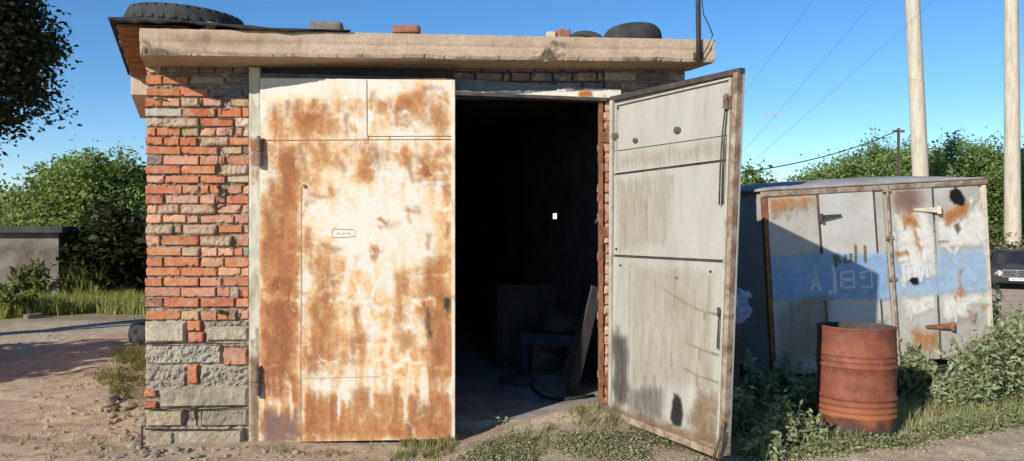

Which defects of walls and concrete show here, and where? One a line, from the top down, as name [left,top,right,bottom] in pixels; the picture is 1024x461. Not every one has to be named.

rust [375,87,446,131]
rust [249,100,451,442]
damp [612,334,683,426]